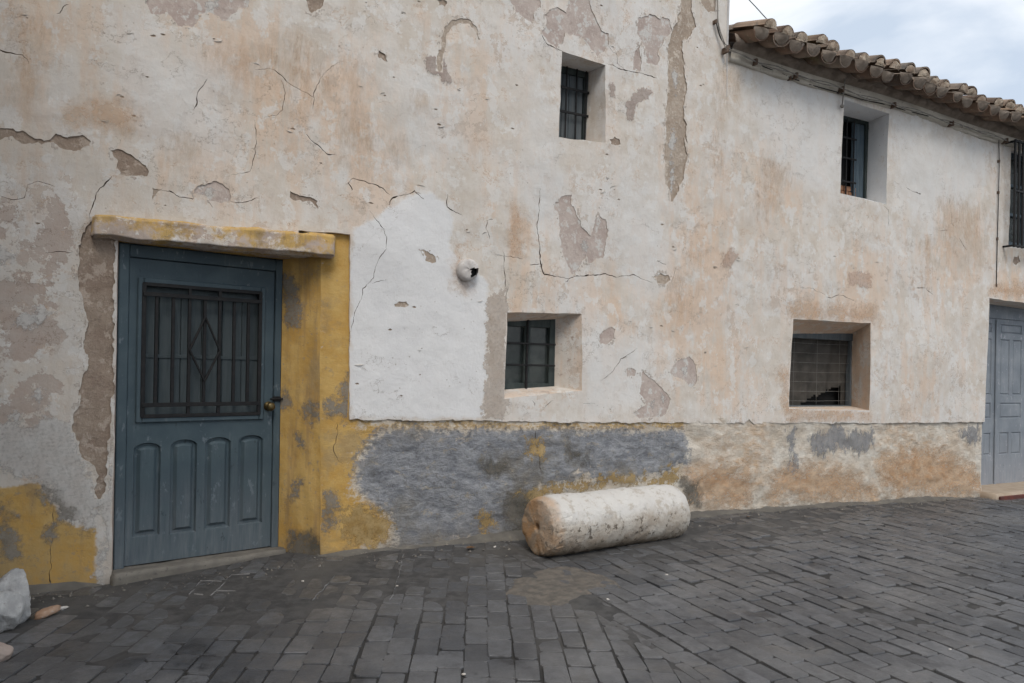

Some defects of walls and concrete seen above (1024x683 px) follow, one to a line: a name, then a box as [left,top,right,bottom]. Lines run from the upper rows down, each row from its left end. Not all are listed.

spalling [424,15,480,91]
spalling [510,0,613,56]
spalling [0,128,94,151]
spalling [108,148,149,179]
crack [235,63,337,175]
peeling [609,84,653,121]
spalling [633,0,717,202]
crack [348,178,461,327]
crack [486,198,675,294]
spalling [554,195,608,274]
spalling [72,220,116,511]
spalling [625,368,671,421]